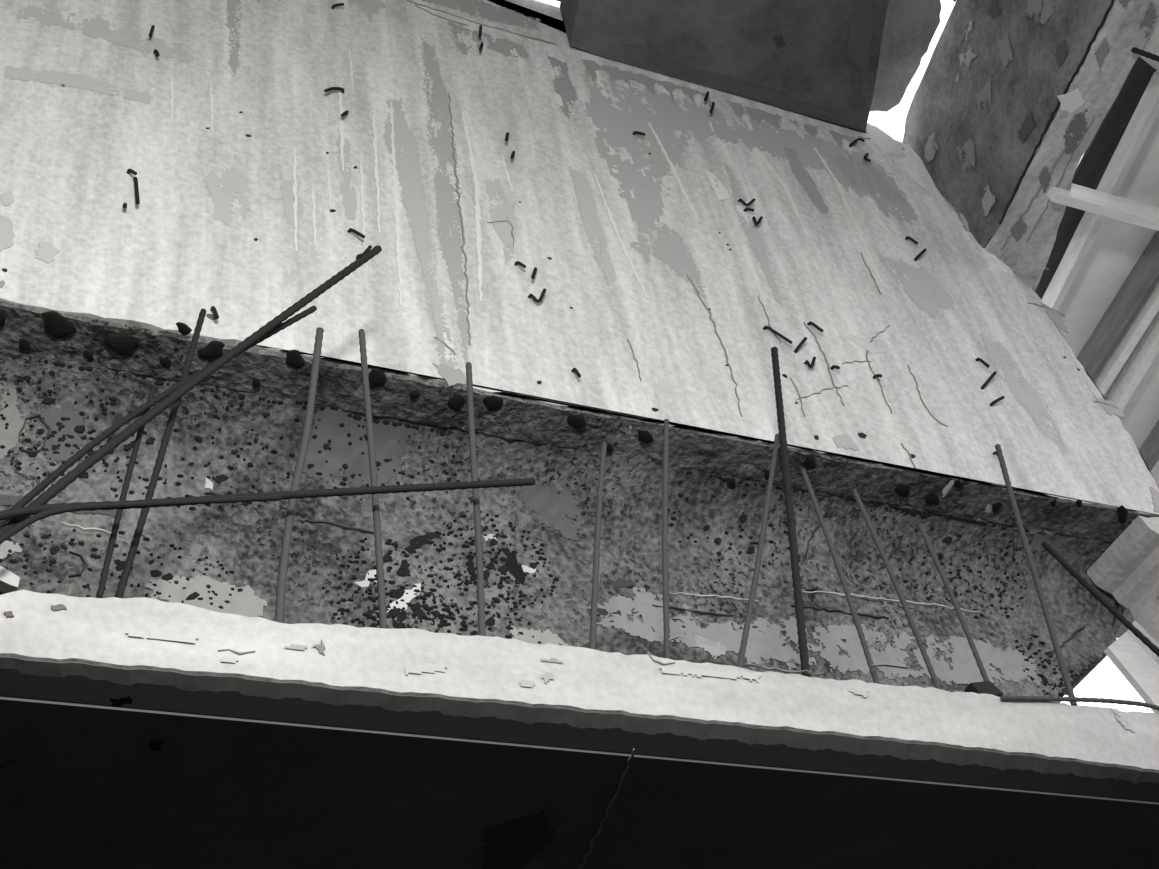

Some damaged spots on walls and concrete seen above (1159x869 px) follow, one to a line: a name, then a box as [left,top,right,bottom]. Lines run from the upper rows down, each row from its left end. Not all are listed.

water stain [547,0,954,319]
crack [687,275,743,417]
crack [758,295,781,344]
crack [790,322,892,417]
crack [908,365,948,427]
spalling [1041,303,1069,333]
peeling [589,347,1159,711]